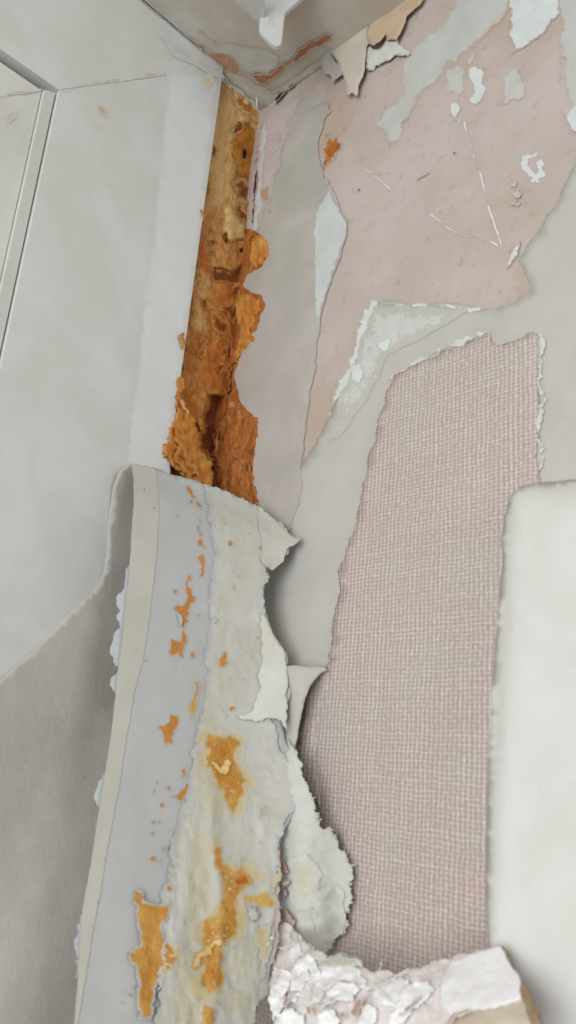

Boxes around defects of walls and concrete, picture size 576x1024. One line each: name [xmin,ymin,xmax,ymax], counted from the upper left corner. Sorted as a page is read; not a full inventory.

peeling [322,0,576,145]
corrosion [322,126,346,167]
peeling [518,151,546,184]